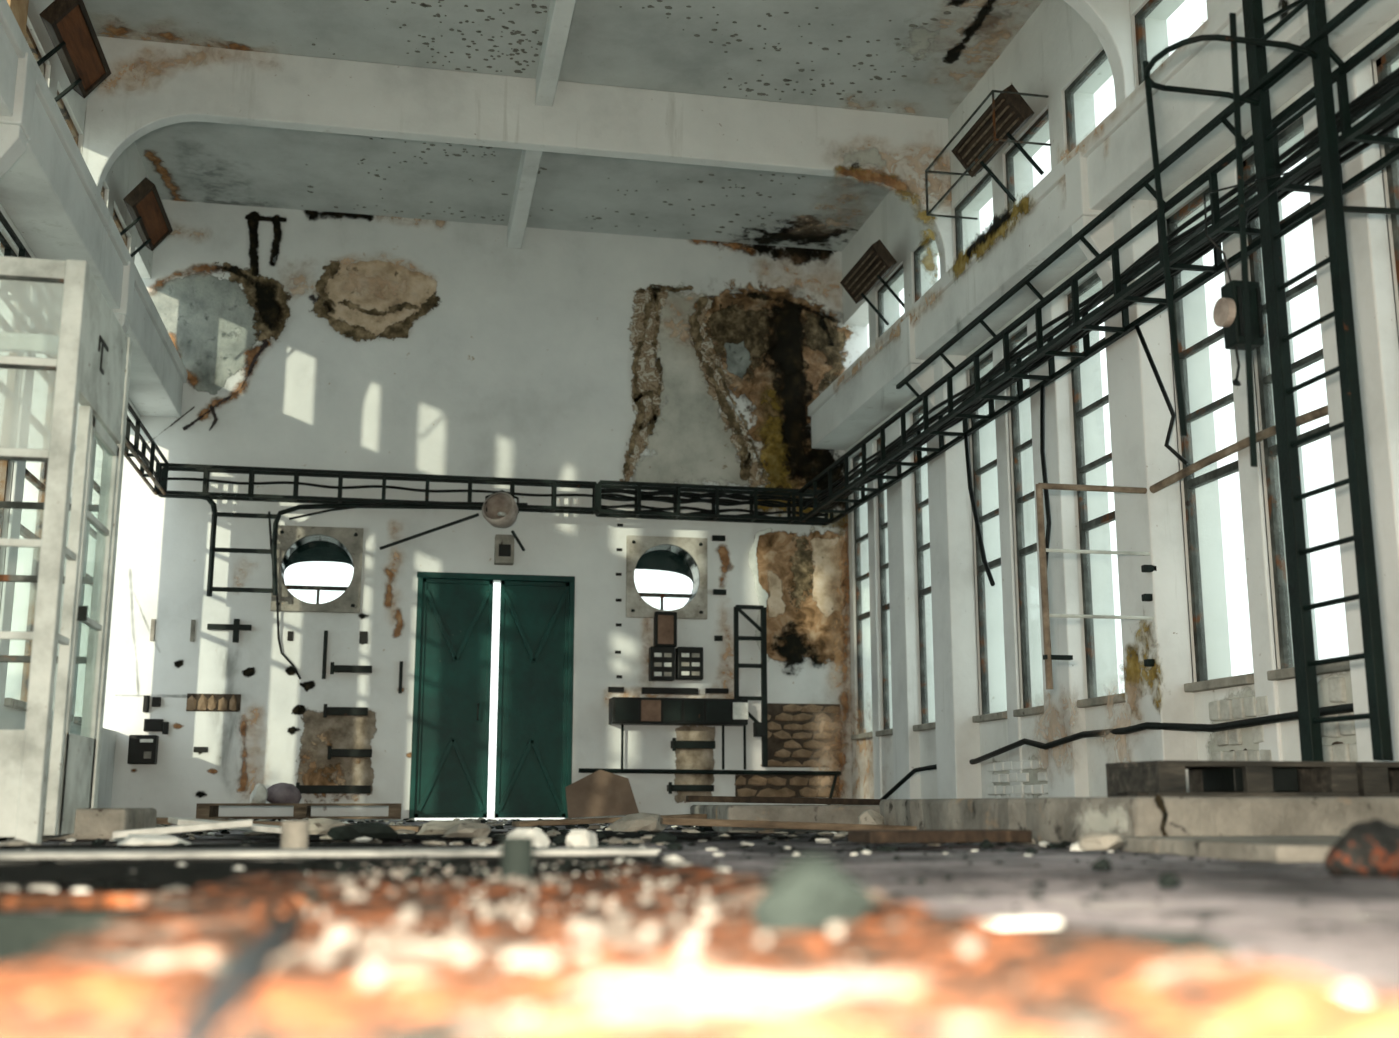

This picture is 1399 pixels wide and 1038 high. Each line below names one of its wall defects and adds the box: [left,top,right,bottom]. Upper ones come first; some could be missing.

corrosion [100,25,251,87]
spalling [149,262,292,395]
spalling [309,259,440,342]
spalling [619,284,769,493]
water stain [689,147,951,510]
spalling [749,528,848,675]